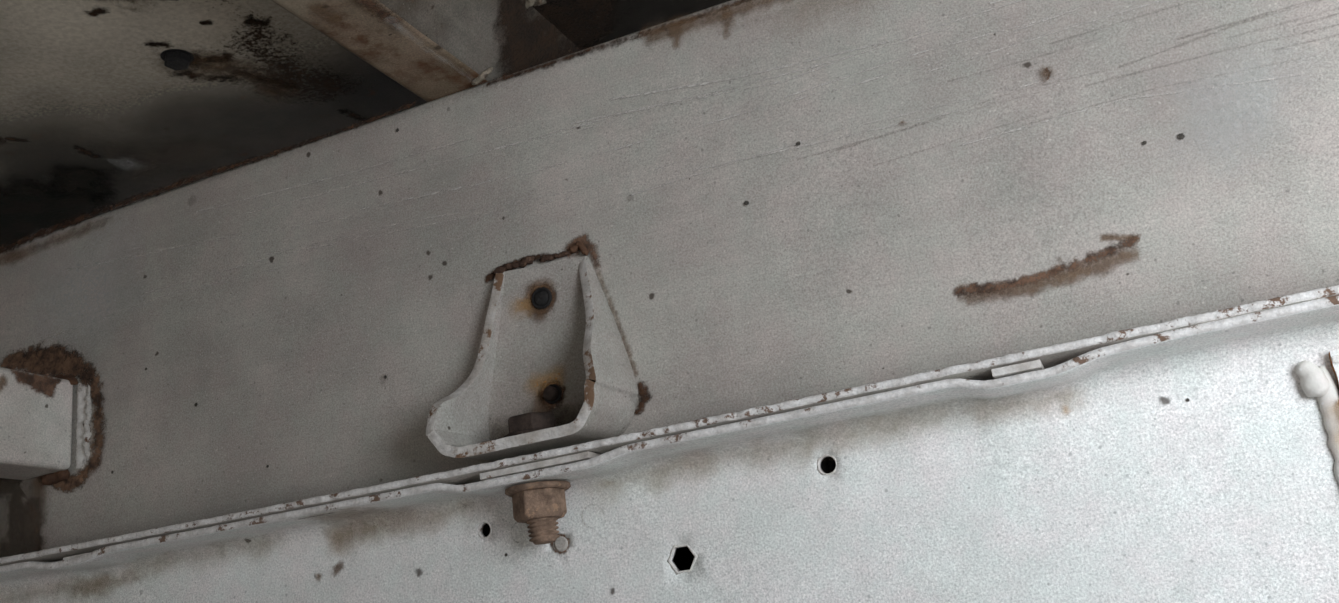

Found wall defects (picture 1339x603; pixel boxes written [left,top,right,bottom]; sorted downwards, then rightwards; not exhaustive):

leakage [0,167,113,246]
corrosion [485,234,652,415]
corrosion [953,235,1140,302]
corrosion [0,341,105,552]